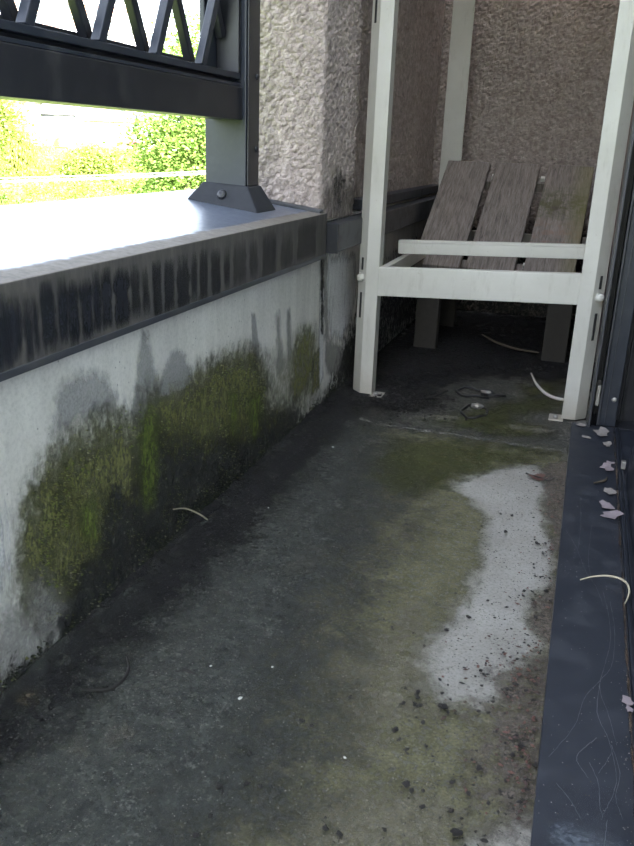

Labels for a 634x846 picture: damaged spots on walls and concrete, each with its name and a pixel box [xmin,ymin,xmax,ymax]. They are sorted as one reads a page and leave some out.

leakage [0,254,595,846]